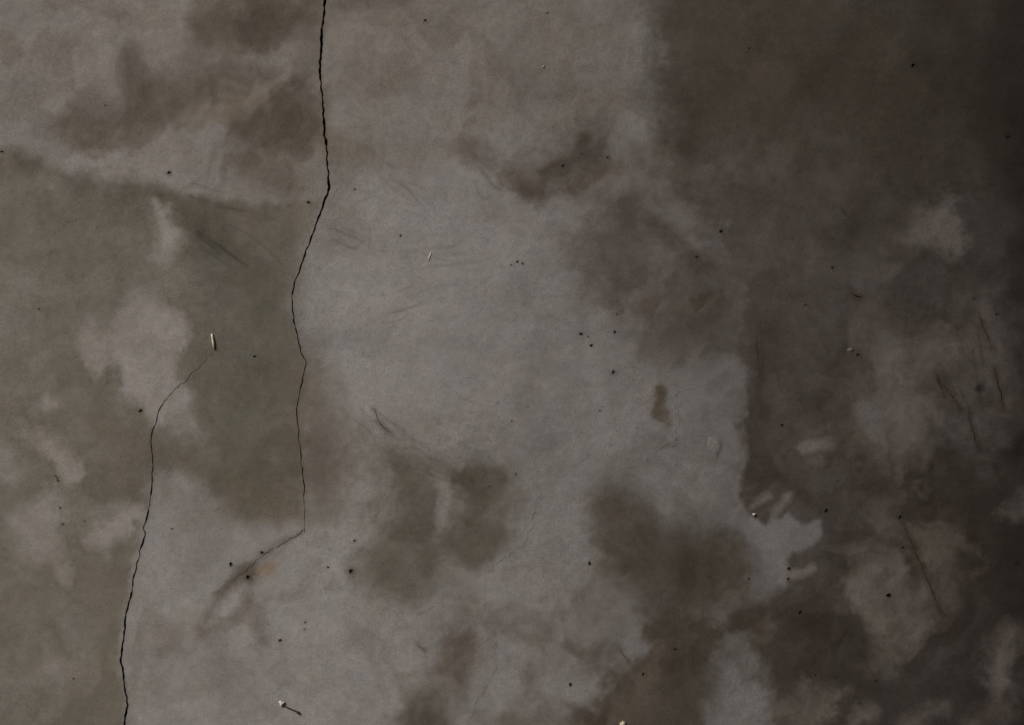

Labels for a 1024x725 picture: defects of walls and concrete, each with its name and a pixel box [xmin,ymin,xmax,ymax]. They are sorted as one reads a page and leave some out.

crack [120,358,207,725]
water stain [0,0,541,725]
crack [237,0,331,577]
water stain [437,0,1024,725]